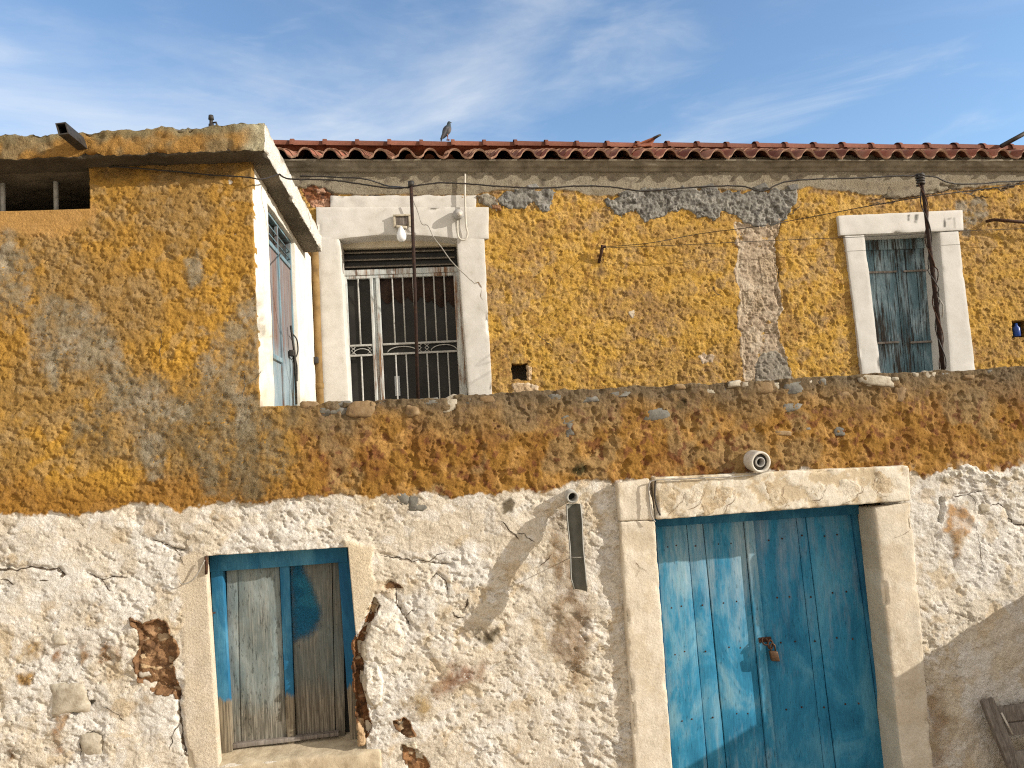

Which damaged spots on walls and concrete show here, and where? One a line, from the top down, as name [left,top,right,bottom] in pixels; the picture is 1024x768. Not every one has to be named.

spalling [477,193,511,211]
peeling [733,219,793,381]
crack [503,522,552,565]
crack [0,566,128,591]
crack [381,553,468,618]
spalling [129,617,182,700]
spalling [351,581,403,746]
spalling [393,717,430,768]